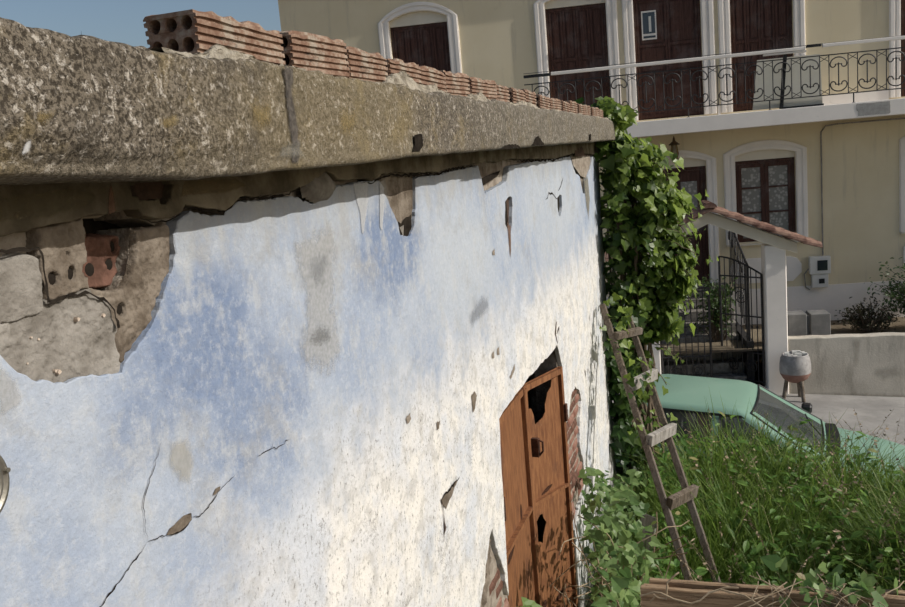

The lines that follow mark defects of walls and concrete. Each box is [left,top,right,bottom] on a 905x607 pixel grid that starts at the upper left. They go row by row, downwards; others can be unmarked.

spalling [130,182,165,202]
spalling [354,173,413,236]
spalling [473,161,502,185]
spalling [0,218,170,411]
spalling [566,389,584,519]
crack [99,444,166,607]
spalling [441,478,459,535]
spalling [480,538,509,607]